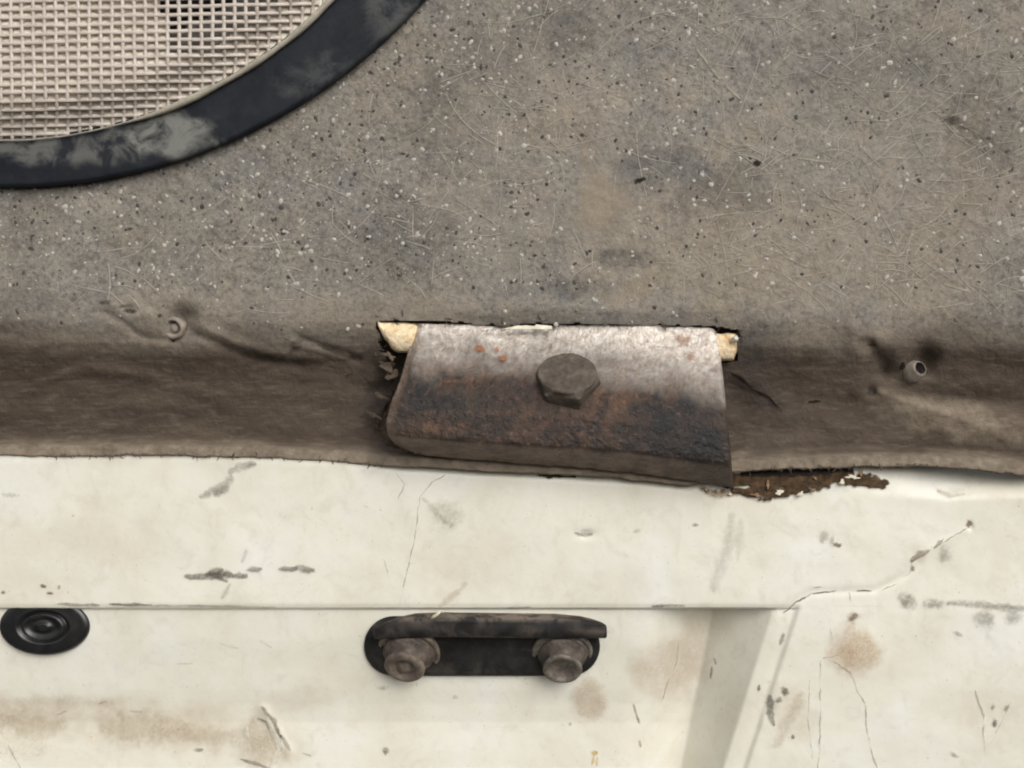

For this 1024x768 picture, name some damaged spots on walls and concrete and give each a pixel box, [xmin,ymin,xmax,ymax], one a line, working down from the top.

rust [702,468,889,501]
crack [783,585,893,613]